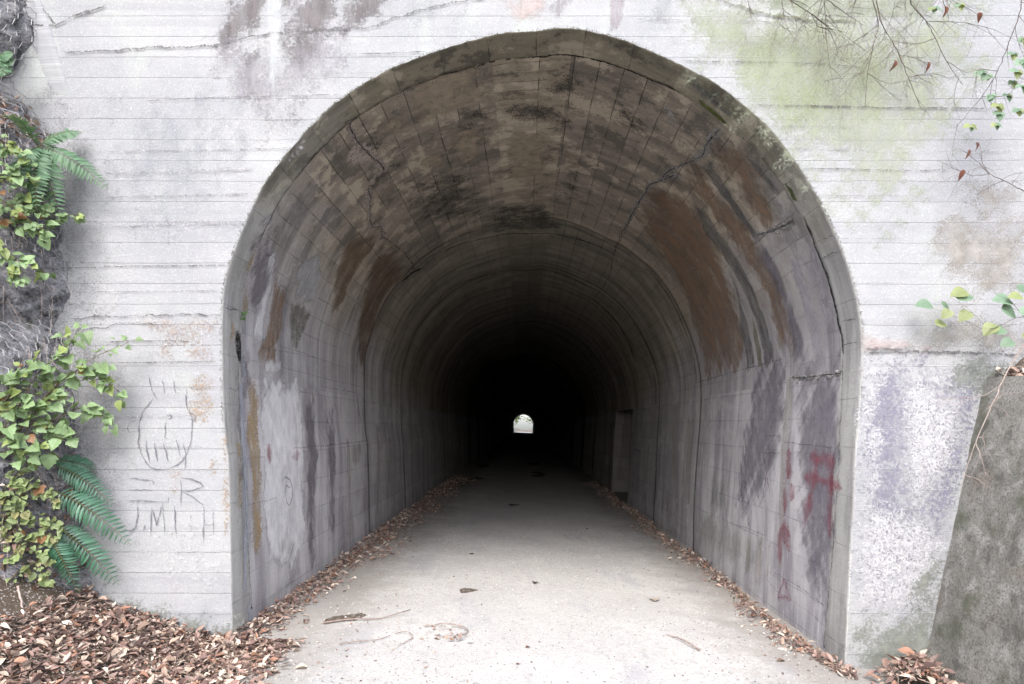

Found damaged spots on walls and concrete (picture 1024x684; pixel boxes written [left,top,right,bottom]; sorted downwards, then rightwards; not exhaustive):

crack [64,0,468,121]
leakage [213,0,384,133]
leakage [500,73,585,130]
rust [335,238,400,365]
leakage [403,172,582,233]
crack [259,54,1024,648]
rust [693,173,793,342]
leakage [696,205,838,583]
rust [209,378,265,555]